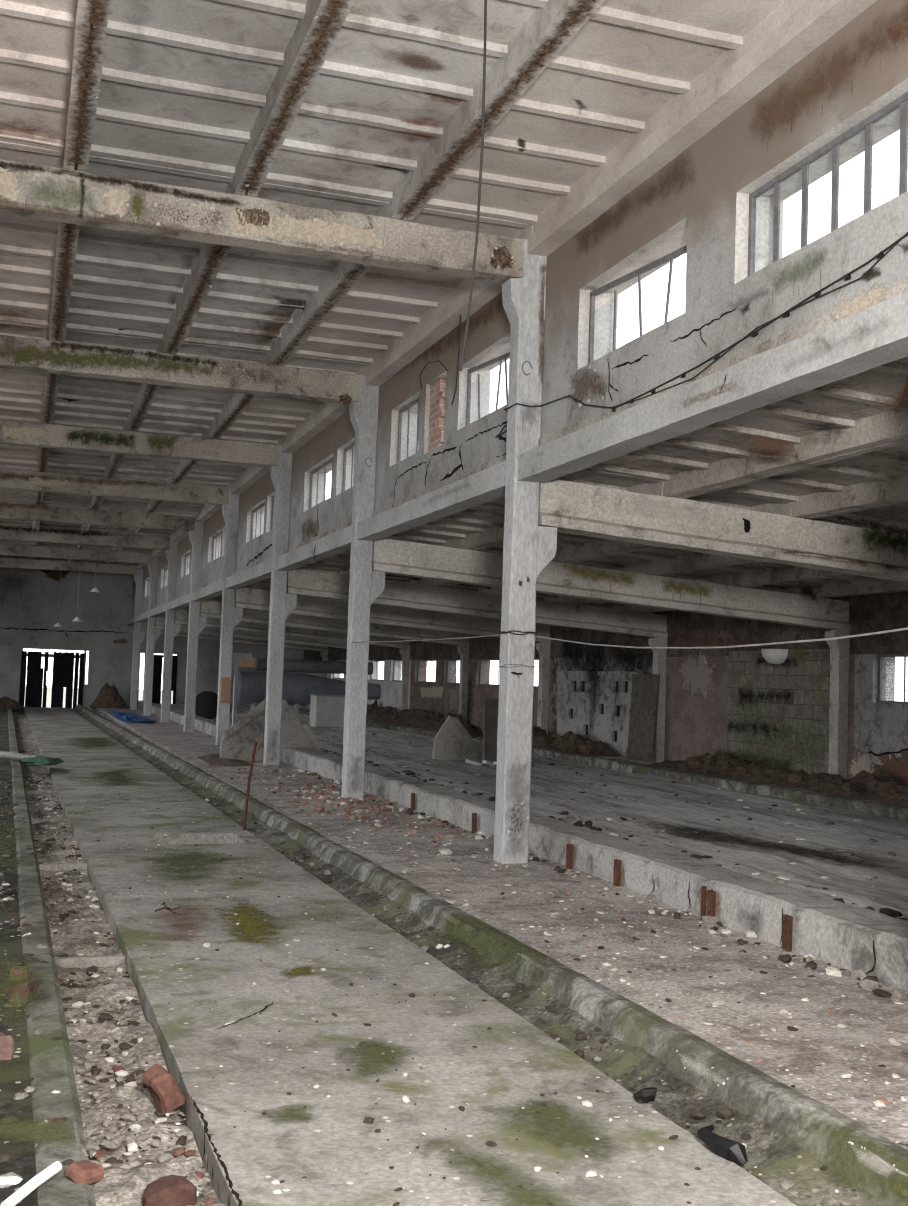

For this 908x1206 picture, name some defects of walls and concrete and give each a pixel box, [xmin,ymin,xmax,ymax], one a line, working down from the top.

leakage [760,13,908,151]
leakage [0,0,347,365]
leakage [261,265,367,363]
crack [394,421,507,498]
flaking render [848,747,908,786]
crack [191,1097,243,1206]